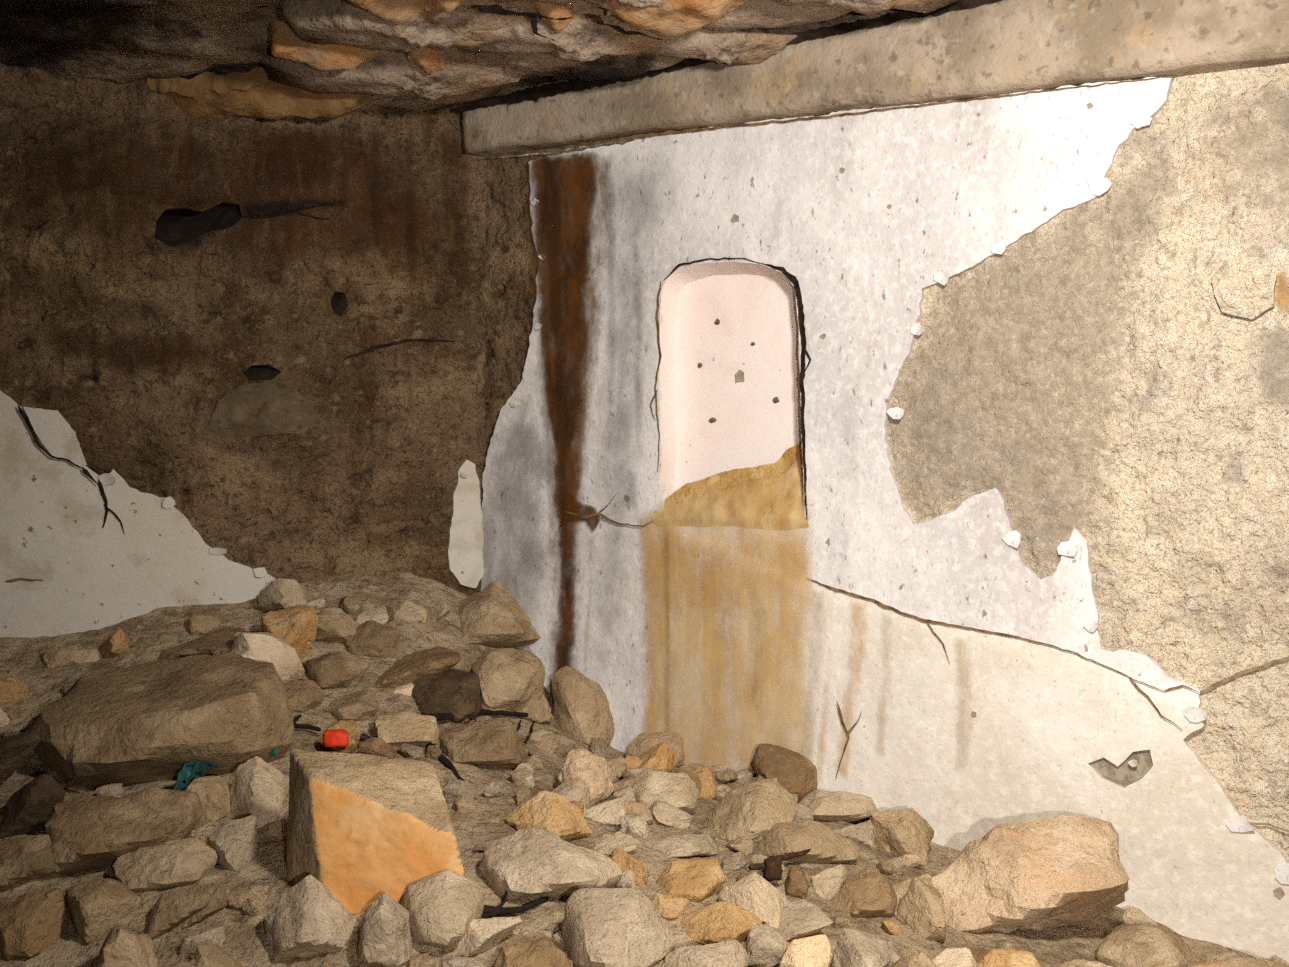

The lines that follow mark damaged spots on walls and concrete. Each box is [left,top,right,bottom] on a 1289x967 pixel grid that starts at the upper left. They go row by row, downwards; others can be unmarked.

spalling [347,0,465,25]
spalling [532,0,573,34]
spalling [599,0,743,36]
spalling [0,21,542,638]
crack [18,405,125,534]
rust [531,154,608,670]
spalling [886,63,1289,899]
leakage [646,467,808,772]
crack [806,578,1289,730]